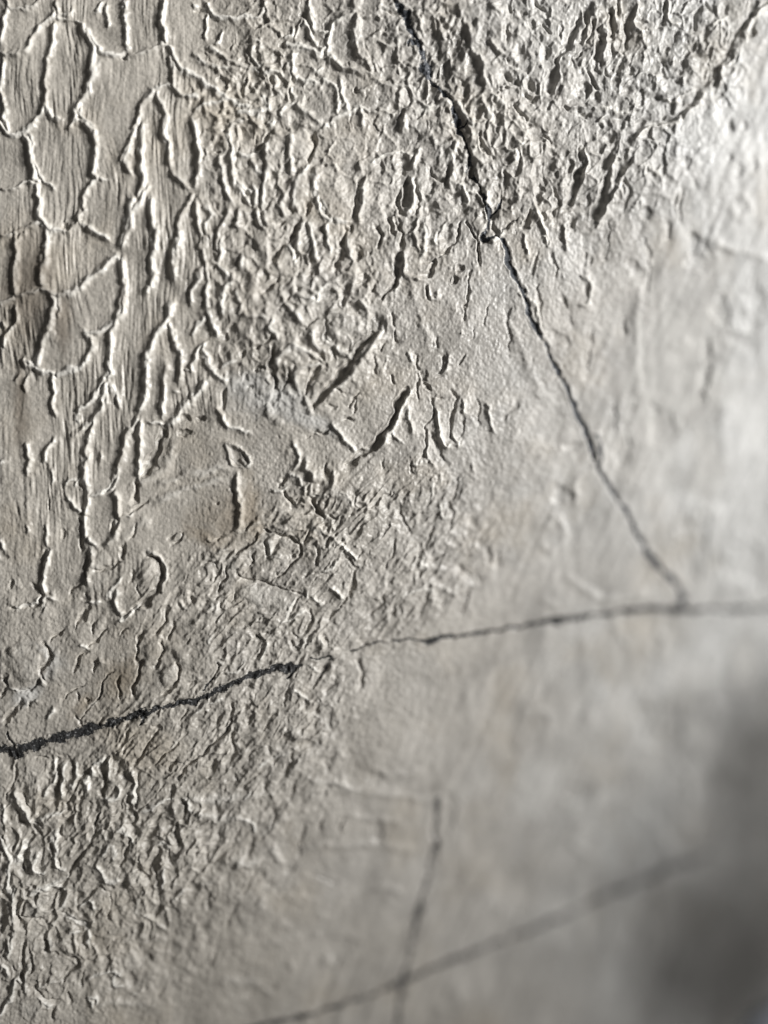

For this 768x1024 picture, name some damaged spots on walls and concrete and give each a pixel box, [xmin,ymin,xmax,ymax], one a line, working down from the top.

spalling [311,267,406,408]
crack [0,0,733,760]
spalling [141,414,206,479]
spalling [225,441,251,469]
spalling [344,386,415,471]
spalling [134,551,170,610]
peeling [252,529,302,578]
peeling [319,553,358,612]
crack [169,717,232,780]